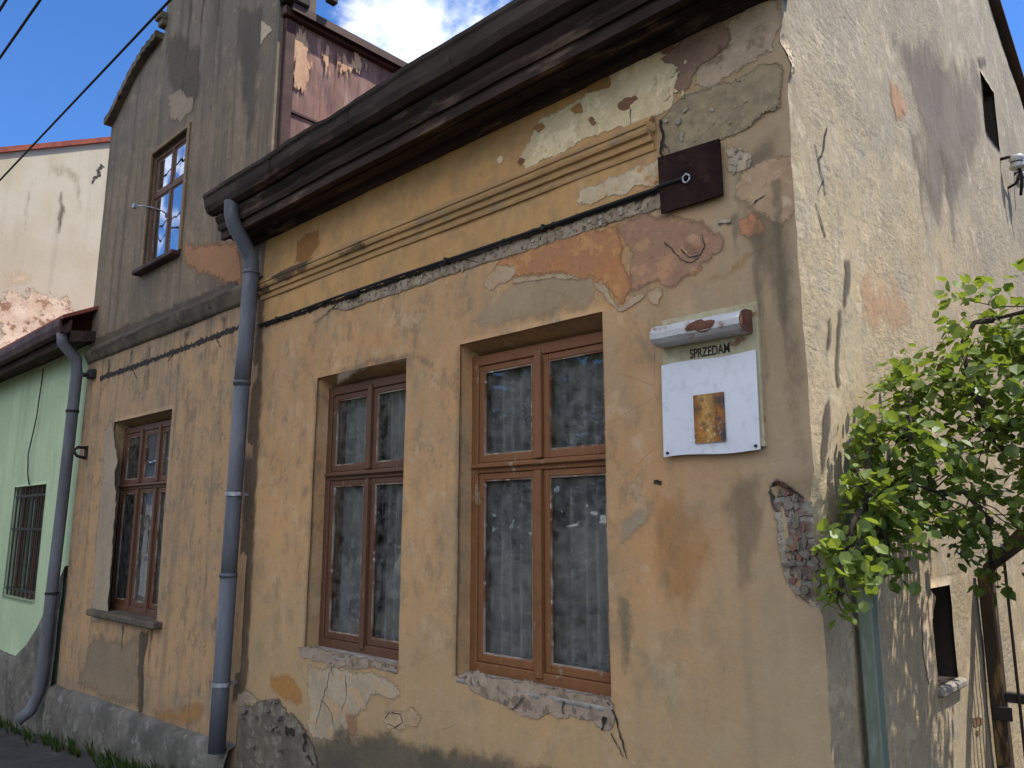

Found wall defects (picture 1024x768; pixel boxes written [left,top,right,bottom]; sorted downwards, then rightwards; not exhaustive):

crack [92,164,104,184]
peeling [168,88,193,124]
peeling [333,0,795,311]
crack [815,127,827,236]
water stain [904,44,987,221]
peeling [184,240,242,285]
spalling [0,287,74,349]
spalling [768,479,822,610]
spalling [237,645,421,768]
spalling [457,669,615,730]
crack [601,702,627,759]